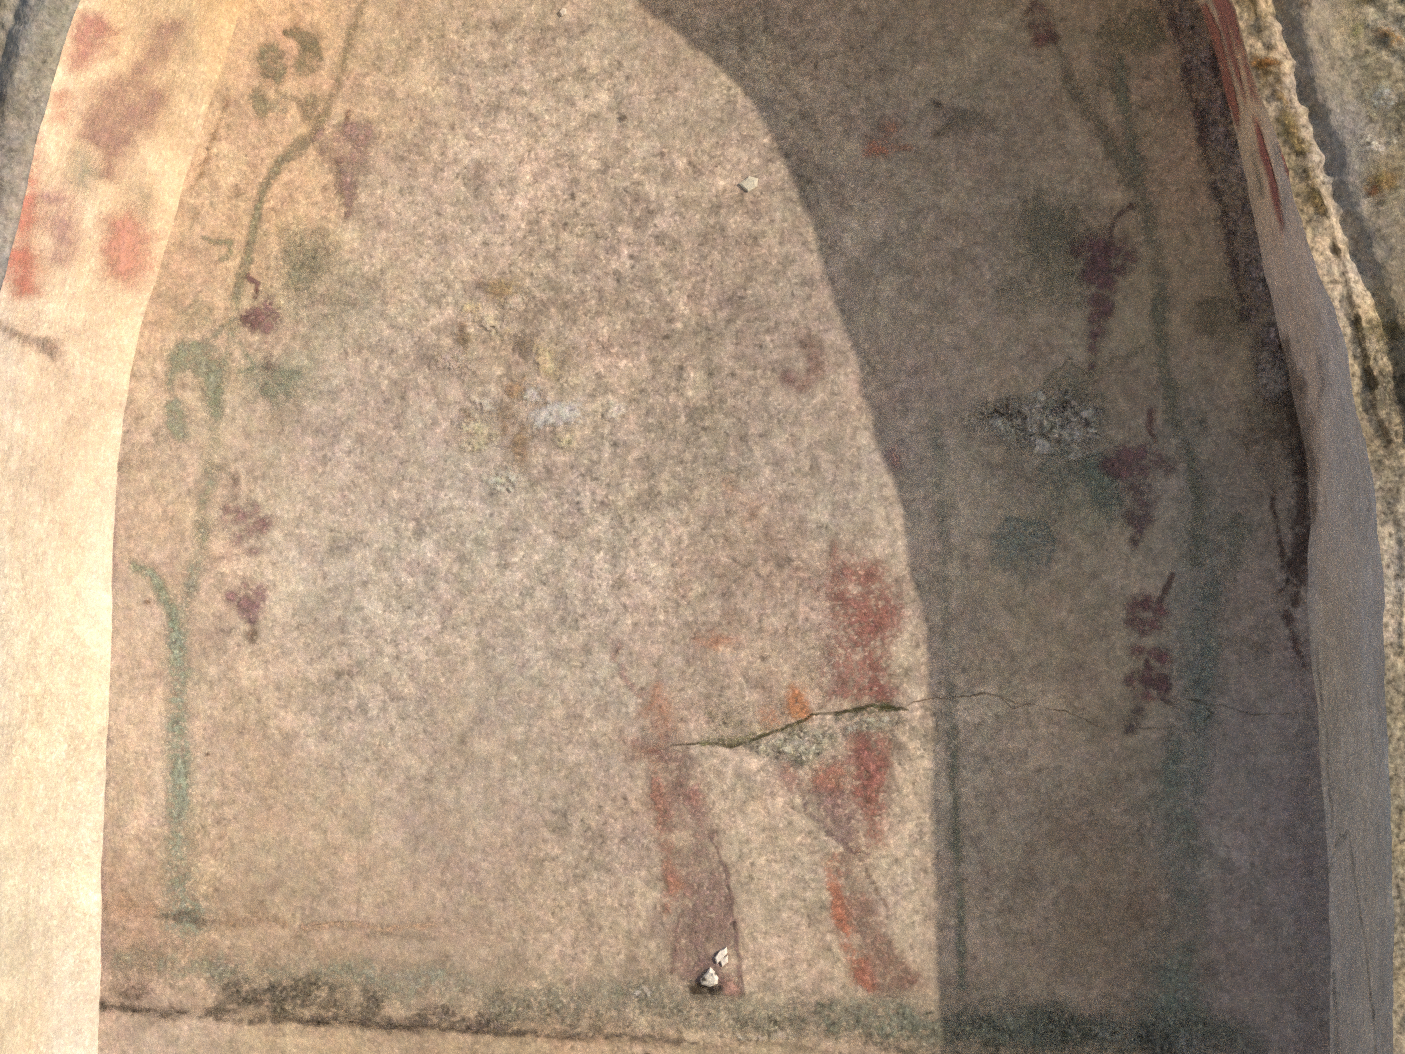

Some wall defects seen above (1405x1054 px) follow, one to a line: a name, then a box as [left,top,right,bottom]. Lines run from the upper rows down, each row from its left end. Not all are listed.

spalling [964,389,1104,459]
crack [678,692,1091,748]